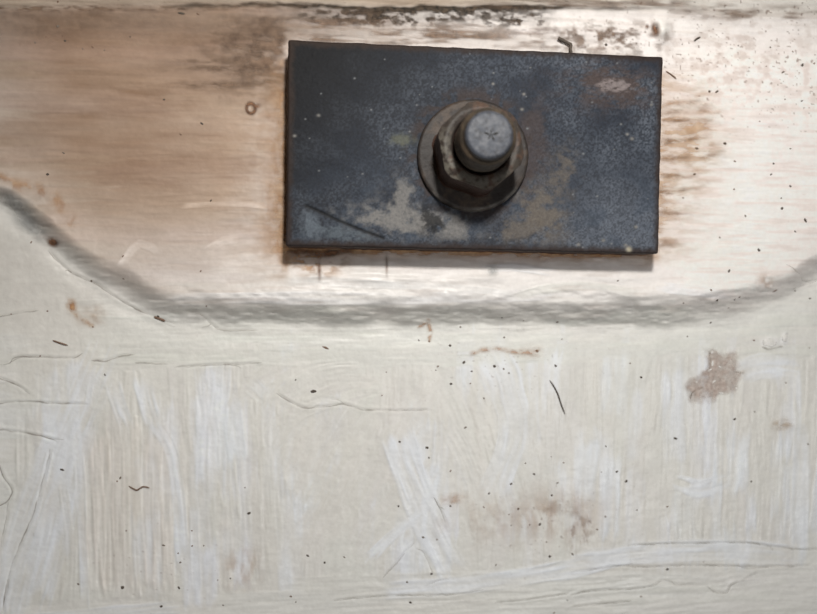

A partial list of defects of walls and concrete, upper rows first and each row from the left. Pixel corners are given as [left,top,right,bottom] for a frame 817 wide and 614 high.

rust [272,91,623,272]
water stain [5,196,38,233]
peeling [687,349,740,399]